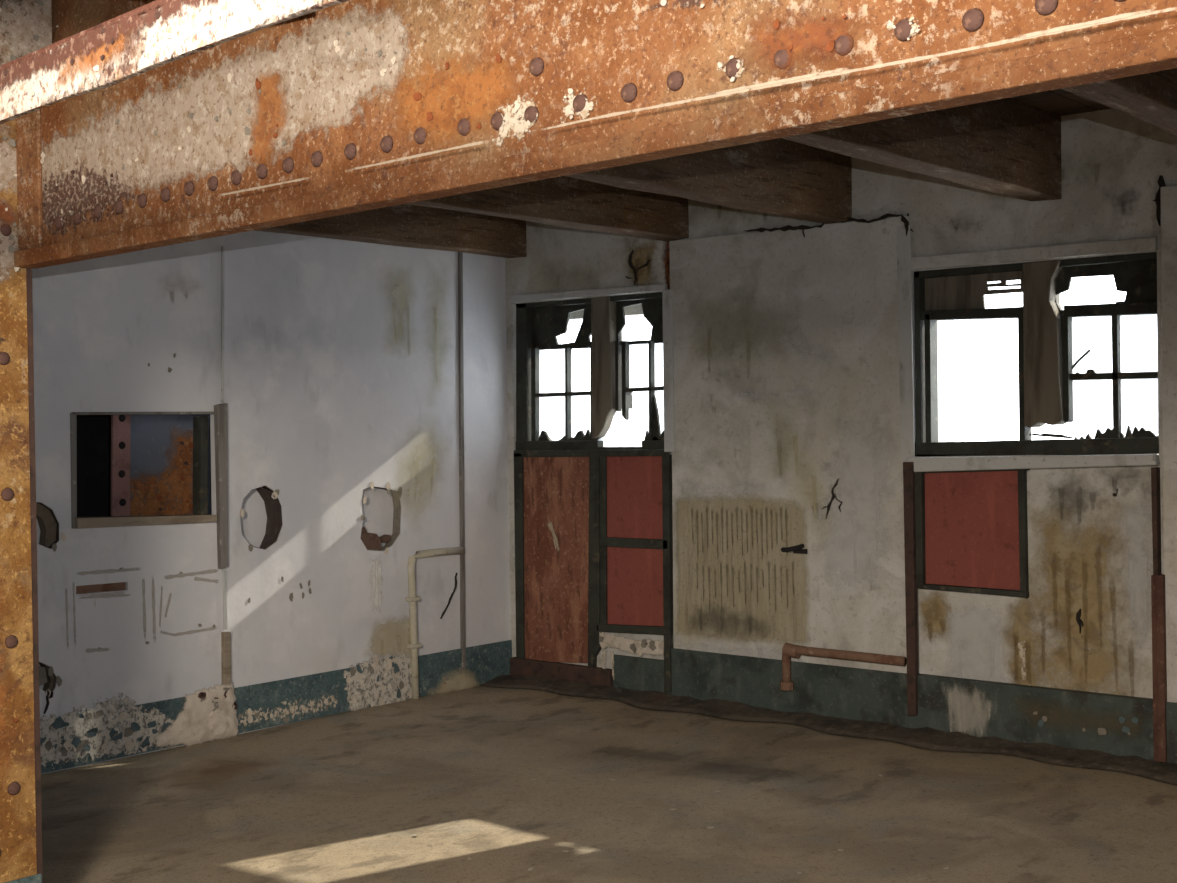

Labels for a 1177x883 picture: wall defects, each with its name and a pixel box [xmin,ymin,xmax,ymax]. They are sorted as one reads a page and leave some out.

rust [0,0,218,91]
peeling [40,0,408,228]
rust [249,74,286,163]
rust [396,54,511,142]
peeling [548,8,1175,129]
rust [42,162,147,235]
crack [745,213,913,237]
spalling [361,482,402,554]
water stain [677,497,806,642]
water stain [921,593,948,634]
water stain [1008,519,1125,695]
peeling [39,654,412,769]